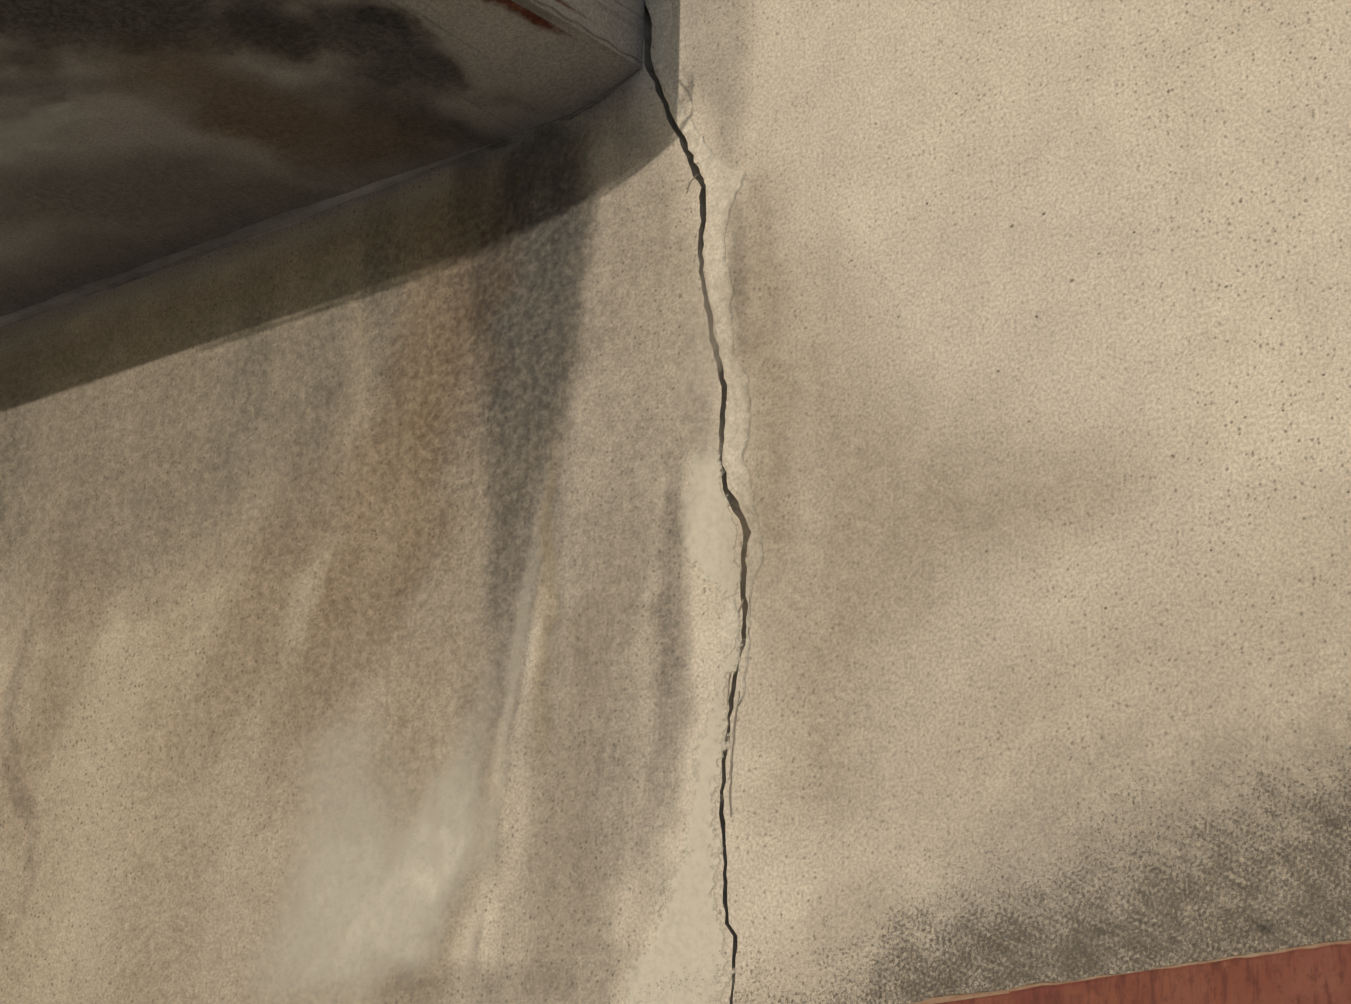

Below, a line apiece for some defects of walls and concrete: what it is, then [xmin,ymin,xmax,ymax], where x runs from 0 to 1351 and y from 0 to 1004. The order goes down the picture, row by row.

water stain [0,0,467,162]
rust [482,0,564,34]
crack [534,0,751,1004]
water stain [678,445,741,599]
water stain [609,619,1351,1004]